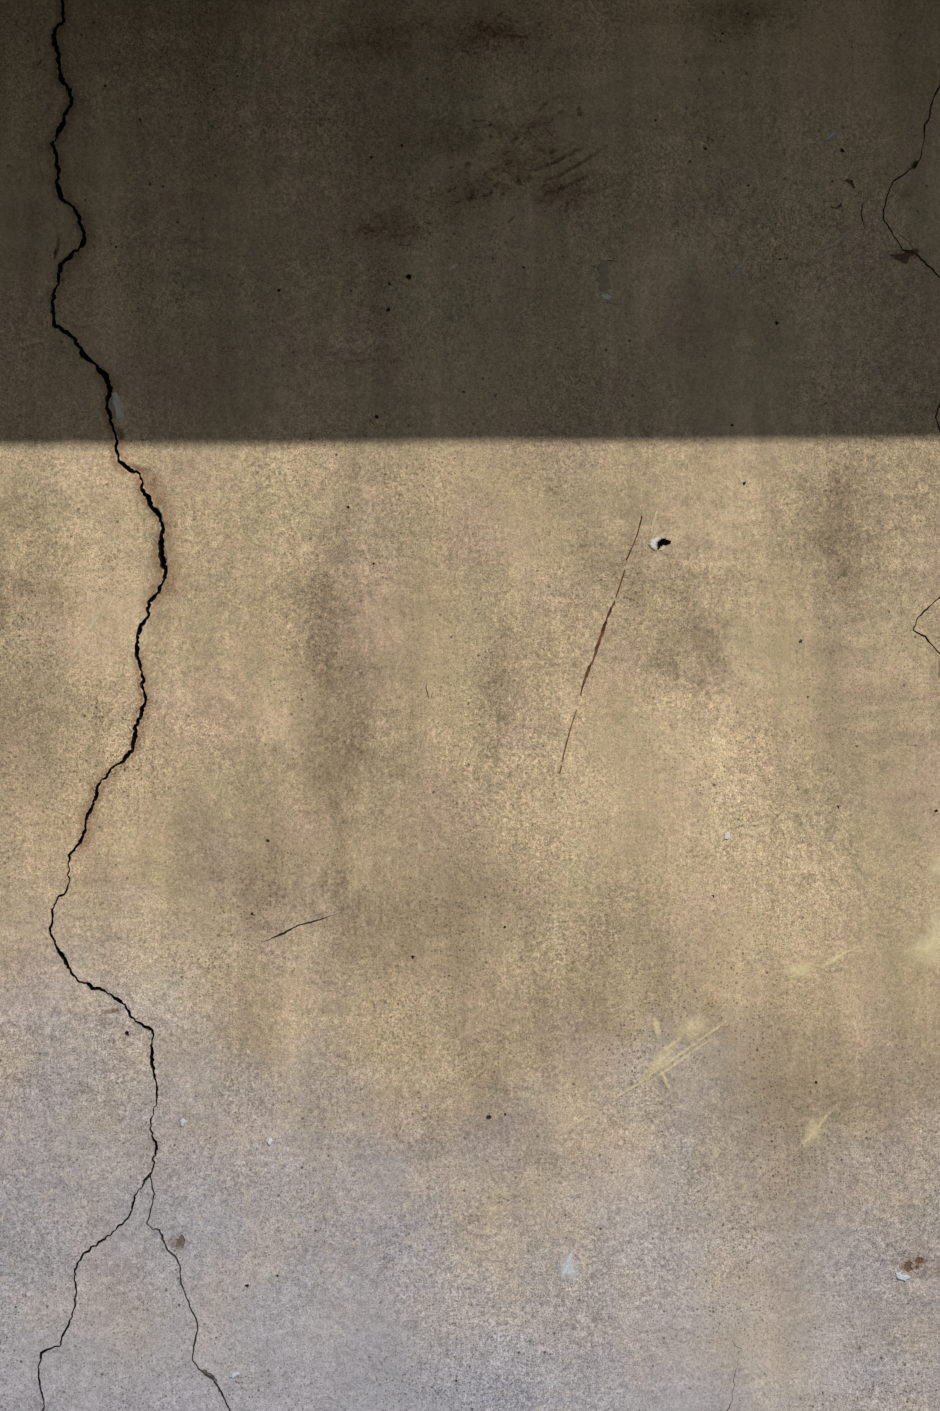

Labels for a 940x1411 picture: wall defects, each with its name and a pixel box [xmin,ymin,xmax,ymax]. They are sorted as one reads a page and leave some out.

crack [860,85,940,278]
crack [38,0,231,1411]
crack [913,597,940,654]